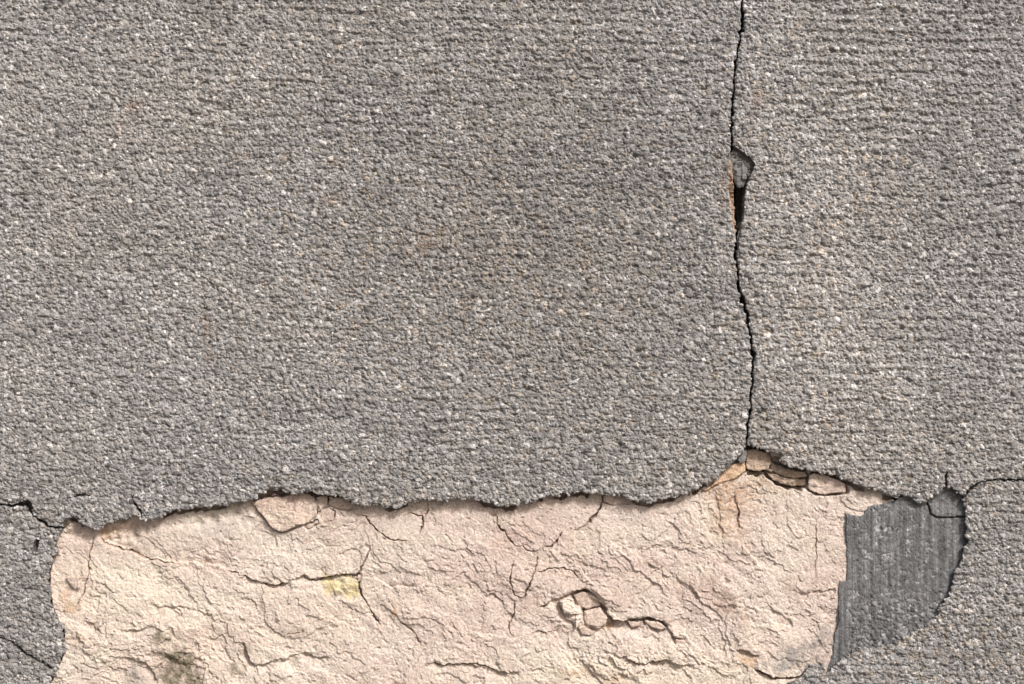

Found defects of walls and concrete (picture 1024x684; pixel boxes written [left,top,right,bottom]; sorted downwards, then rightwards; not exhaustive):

crack [728,0,756,444]
crack [0,500,65,530]
crack [226,502,507,673]
spalling [48,444,972,684]
crack [492,495,604,638]